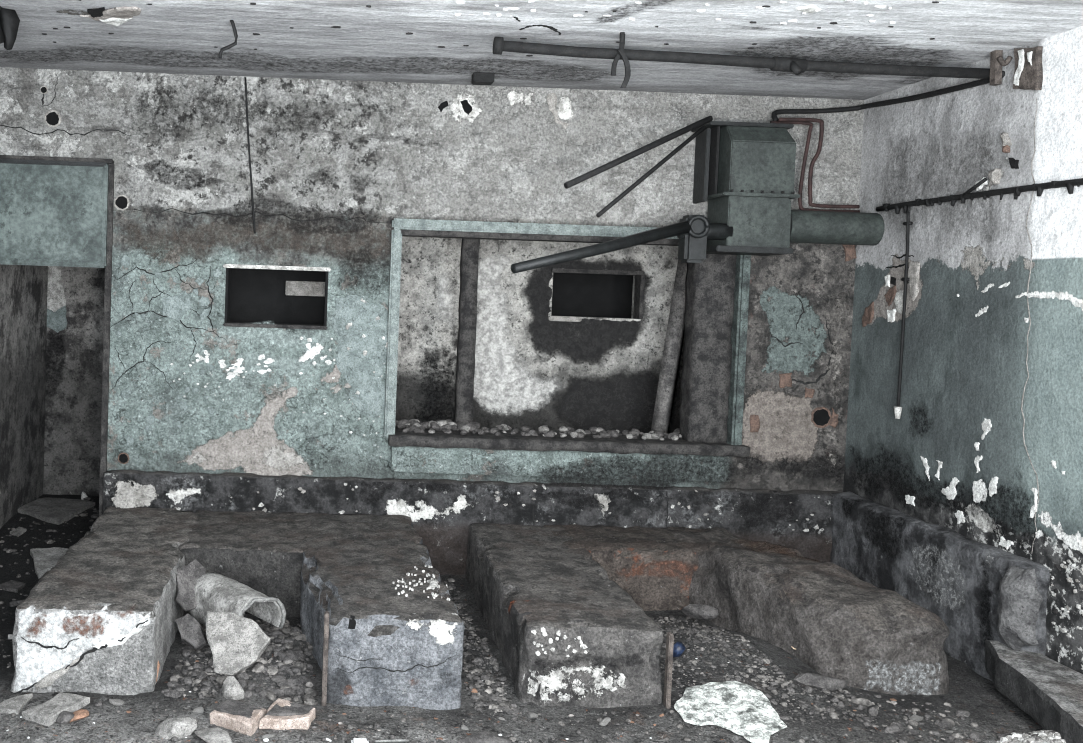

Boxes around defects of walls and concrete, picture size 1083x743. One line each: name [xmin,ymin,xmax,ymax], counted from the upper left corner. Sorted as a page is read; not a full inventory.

damp [127,199,391,263]
crack [110,259,227,388]
flaking render [173,322,351,494]
damp [554,370,659,433]
damp [669,341,684,434]
flaking render [742,339,845,463]
damp [842,446,1035,558]
peeling [921,418,1014,550]
peeling [1029,488,1083,638]
corrosion [28,615,47,637]
crack [11,620,148,694]
corrosion [63,614,105,638]